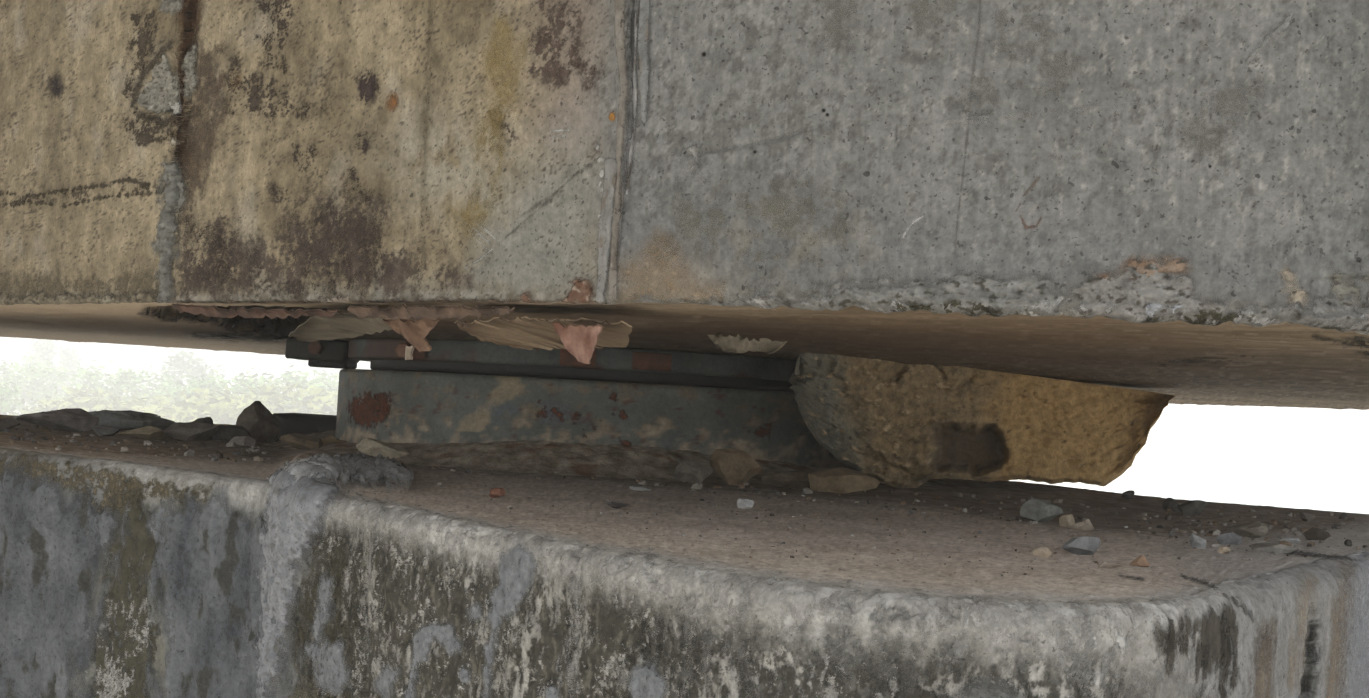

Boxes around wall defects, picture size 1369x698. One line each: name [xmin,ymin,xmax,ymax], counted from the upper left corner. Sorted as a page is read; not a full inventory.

spalling [137,45,197,114]
spalling [160,0,183,15]
corrosion [171,0,200,181]
leakage [527,0,596,90]
leakage [121,0,472,303]
leakage [0,271,160,305]
peeling [0,290,632,364]
peeling [708,333,788,355]
spalling [635,258,1369,335]
corrosion [346,391,392,429]
leakage [0,453,211,698]
leakage [274,490,1318,698]